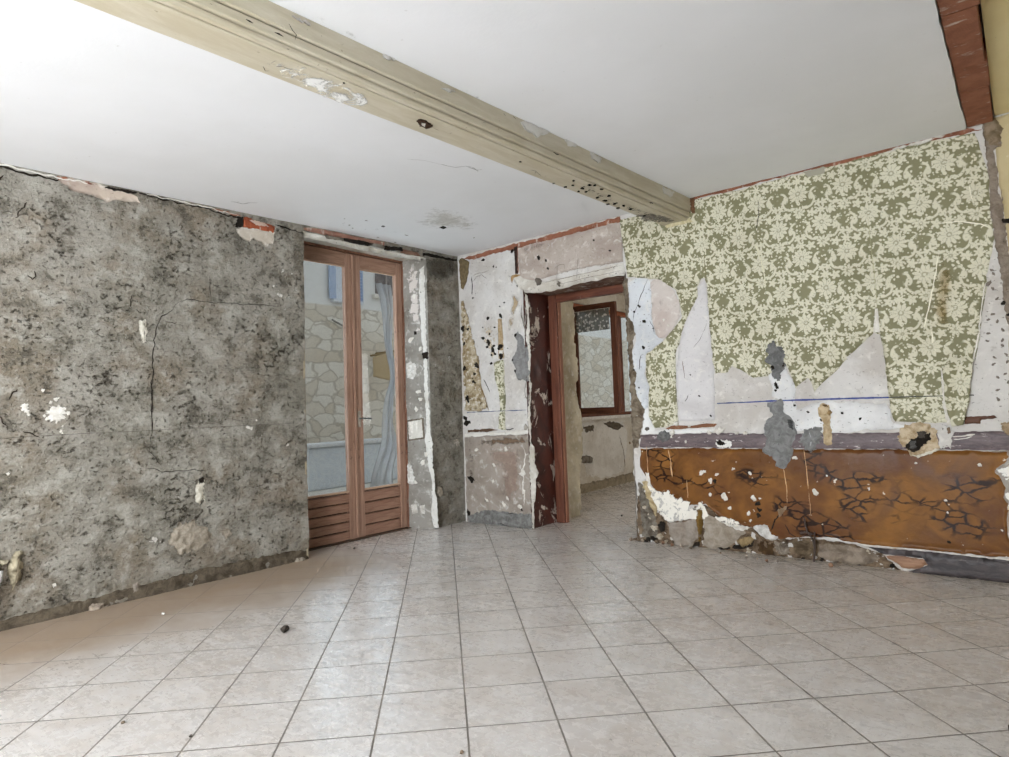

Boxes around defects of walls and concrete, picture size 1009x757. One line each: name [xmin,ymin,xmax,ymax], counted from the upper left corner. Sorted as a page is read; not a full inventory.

spalling [57,176,140,203]
spalling [235,216,275,247]
flaking render [303,217,623,360]
crack [147,279,276,473]
flaking render [582,278,663,478]
spalling [716,439,732,448]
spalling [897,422,940,464]
spalling [633,470,901,570]
crack [771,506,796,537]